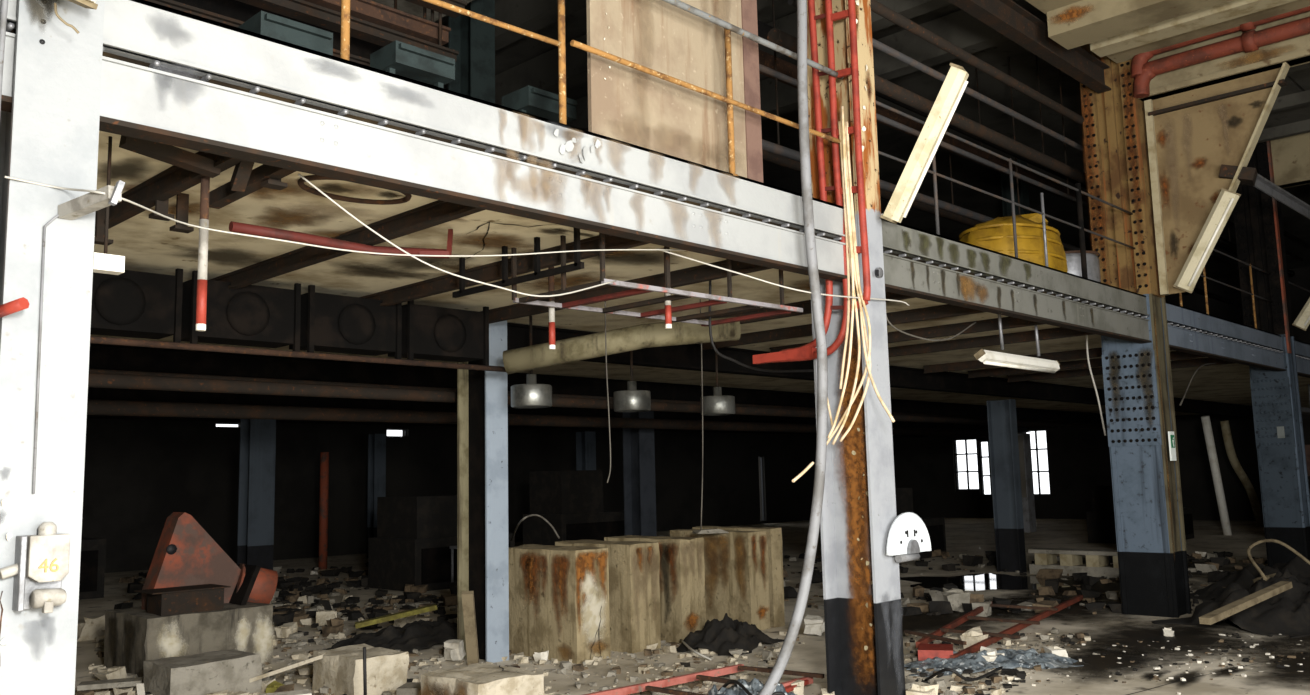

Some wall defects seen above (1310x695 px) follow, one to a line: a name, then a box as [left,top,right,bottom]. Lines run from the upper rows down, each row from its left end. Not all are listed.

rust [1082,86,1106,274]
water stain [345,257,475,277]
water stain [462,236,534,257]
water stain [534,275,600,289]
water stain [594,251,664,264]
water stain [903,231,1031,311]
rust [840,319,871,666]
rust [520,551,607,621]
rust [637,544,677,612]
rust [689,536,766,596]
water stain [902,559,1310,686]